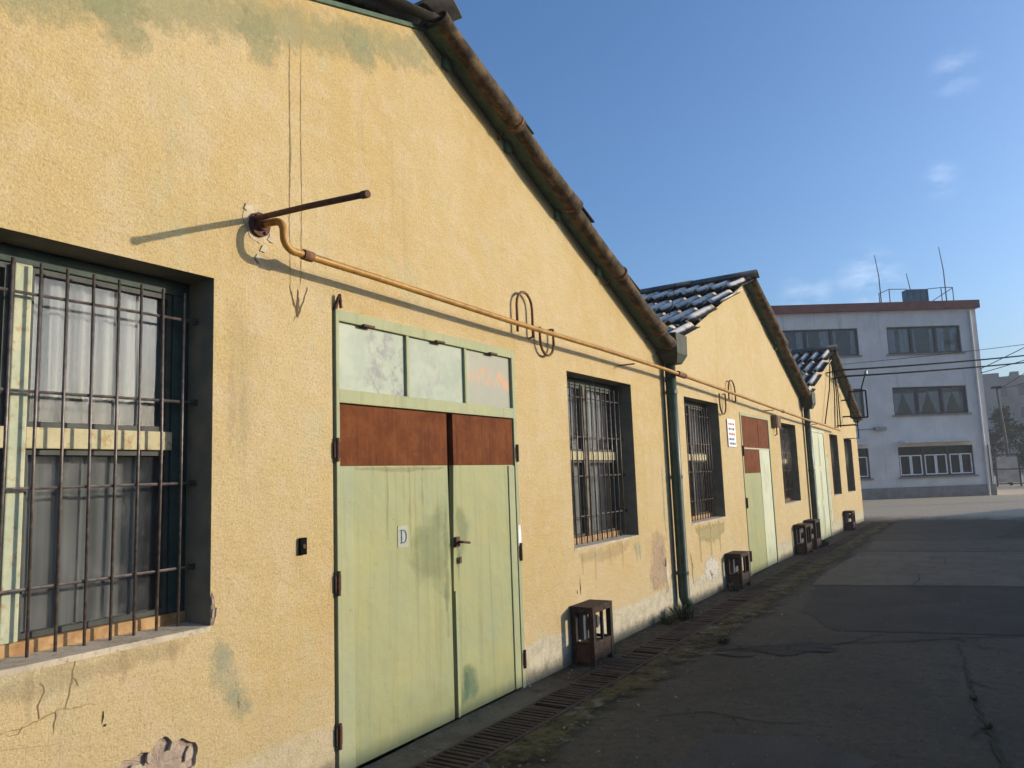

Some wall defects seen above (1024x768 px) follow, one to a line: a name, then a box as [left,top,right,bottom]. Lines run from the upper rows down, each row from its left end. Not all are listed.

spalling [242,202,275,264]
flaking render [651,533,669,592]
crack [1,661,107,737]
spalling [119,736,198,768]